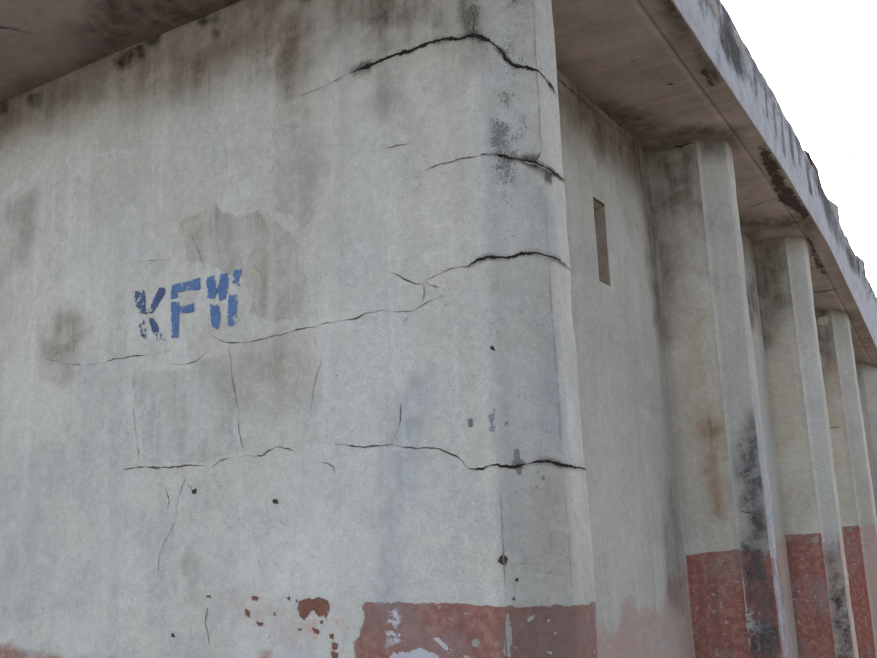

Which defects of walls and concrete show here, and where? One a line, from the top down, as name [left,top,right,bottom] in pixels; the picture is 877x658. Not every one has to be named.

crack [301,8,692,182]
damp [721,3,743,76]
damp [775,126,855,265]
crack [46,215,586,602]
peeling [286,597,338,658]
peeling [495,613,512,657]
damp [740,438,784,658]
mould [831,573,852,658]